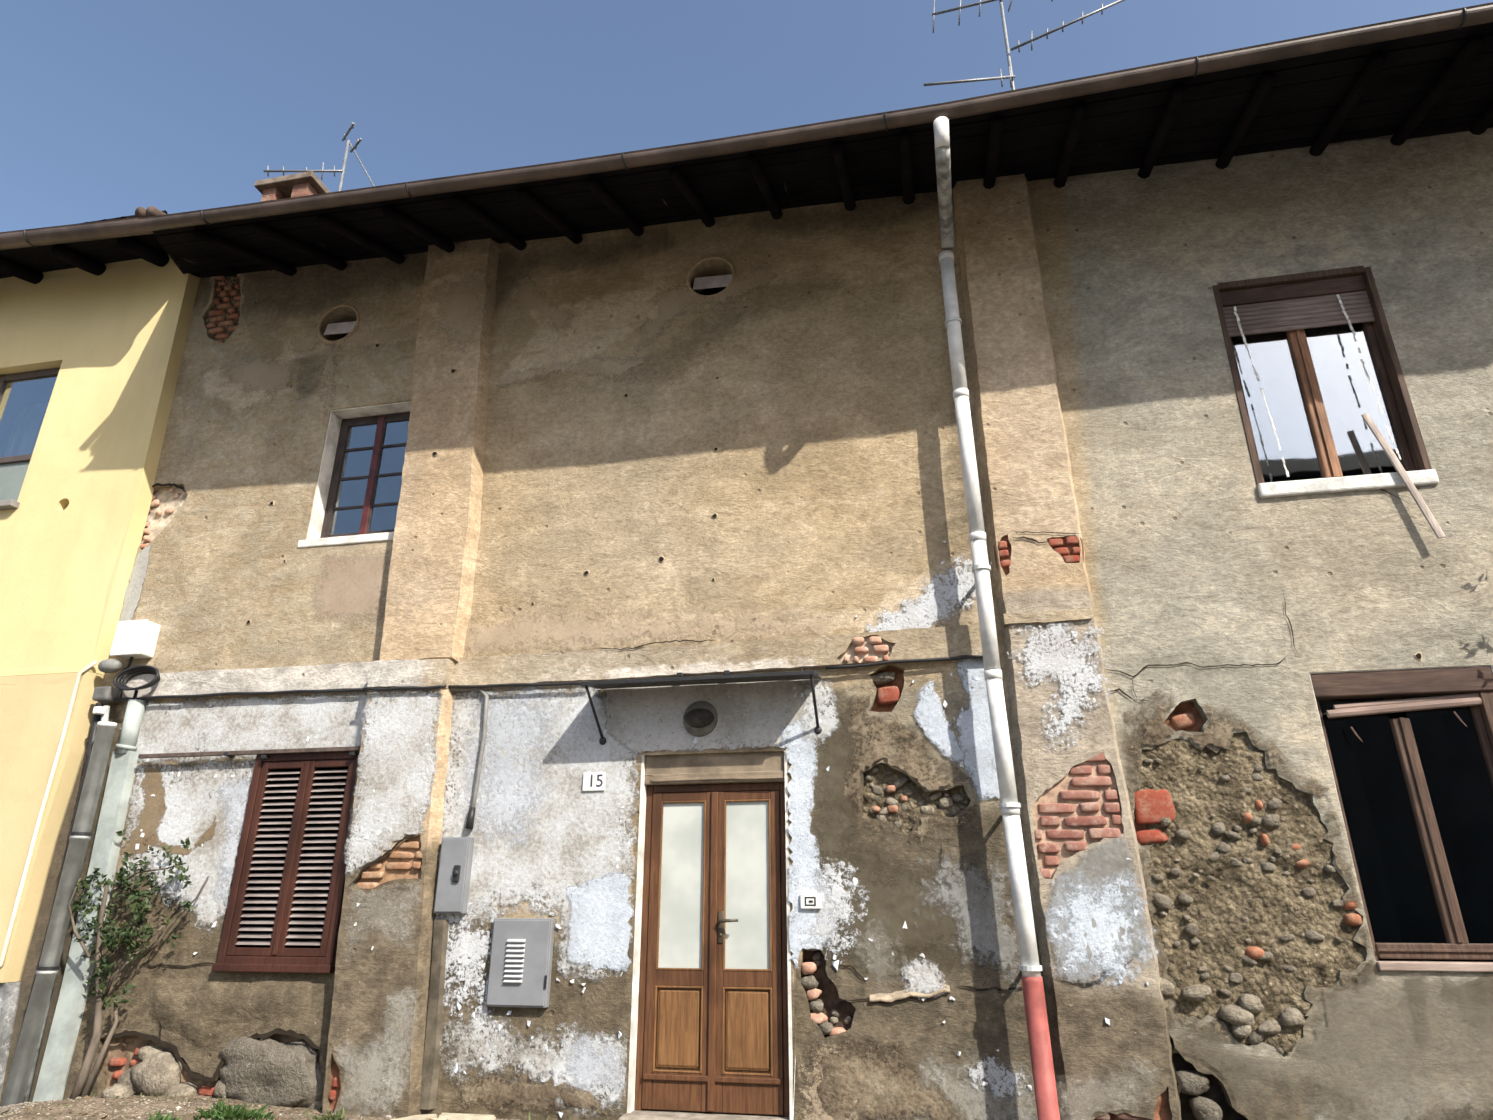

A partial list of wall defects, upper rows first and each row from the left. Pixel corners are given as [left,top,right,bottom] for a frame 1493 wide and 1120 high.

flaking render [204,274,241,343]
flaking render [139,486,188,549]
flaking render [990,536,1011,576]
flaking render [1047,536,1084,563]
crack [1106,597,1301,704]
flaking render [1007,620,1377,1057]
peeling [103,636,1000,1120]
damp [1212,972,1493,1096]
peeling [957,1050,1032,1102]
flaking render [1093,1047,1248,1120]